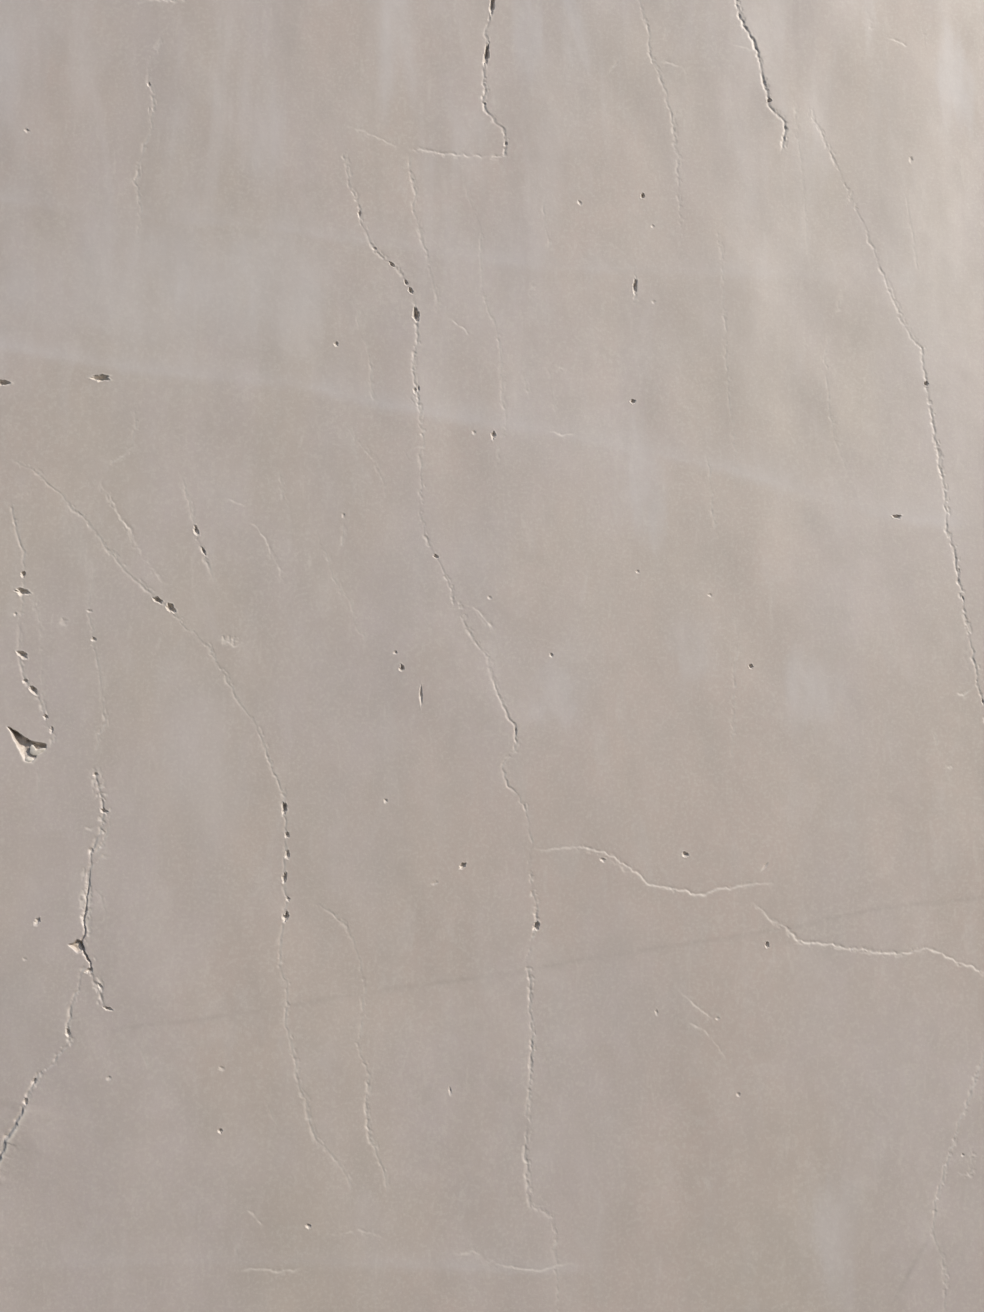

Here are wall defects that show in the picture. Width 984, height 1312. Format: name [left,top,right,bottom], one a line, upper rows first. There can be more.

spalling [5,724,50,802]
crack [0,454,357,1193]
crack [339,0,984,1312]